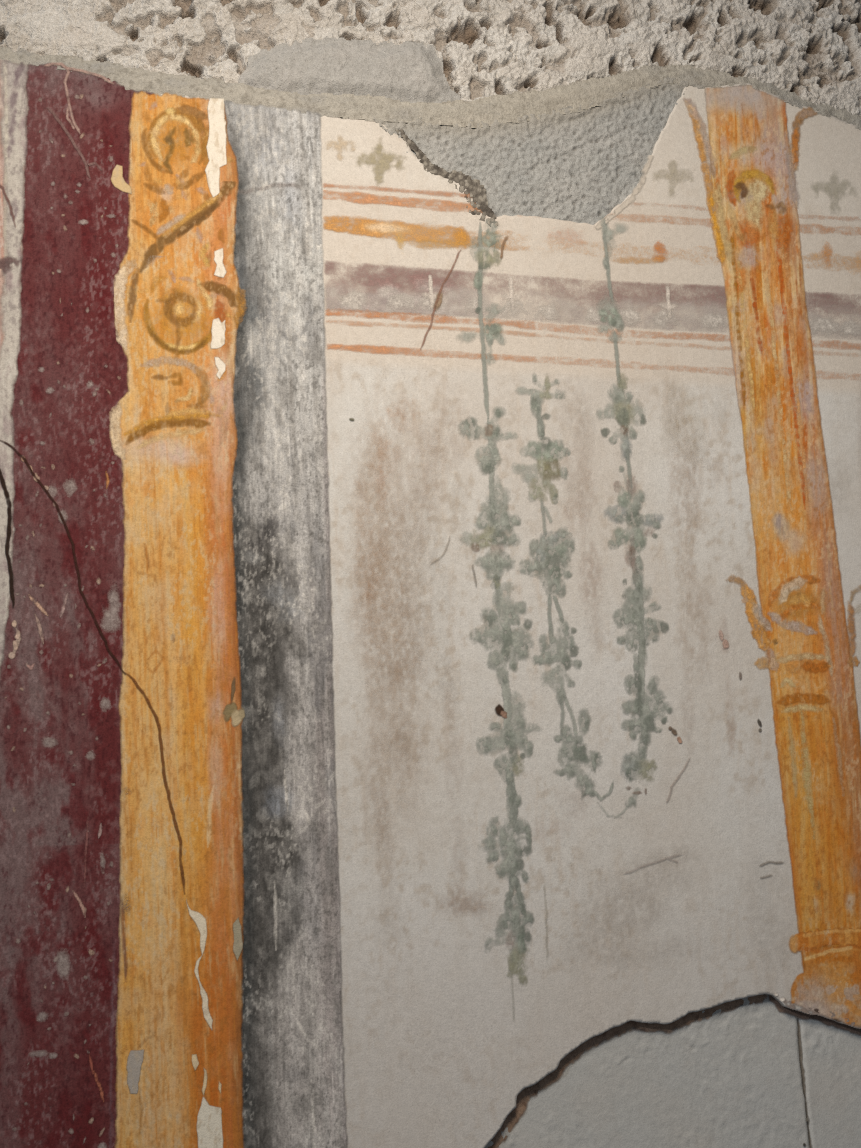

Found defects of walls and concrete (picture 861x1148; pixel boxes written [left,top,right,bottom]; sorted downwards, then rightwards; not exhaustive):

peeling [111,165,132,194]
peeling [205,98,227,197]
flaking render [373,76,688,229]
peeling [214,248,226,277]
crack [421,250,461,347]
peeling [211,318,226,379]
crack [0,441,185,894]
peeling [186,900,213,1028]
peeling [233,918,243,960]
peeling [127,1050,144,1094]
peeling [192,1054,223,1148]
crack [488,993,861,1148]